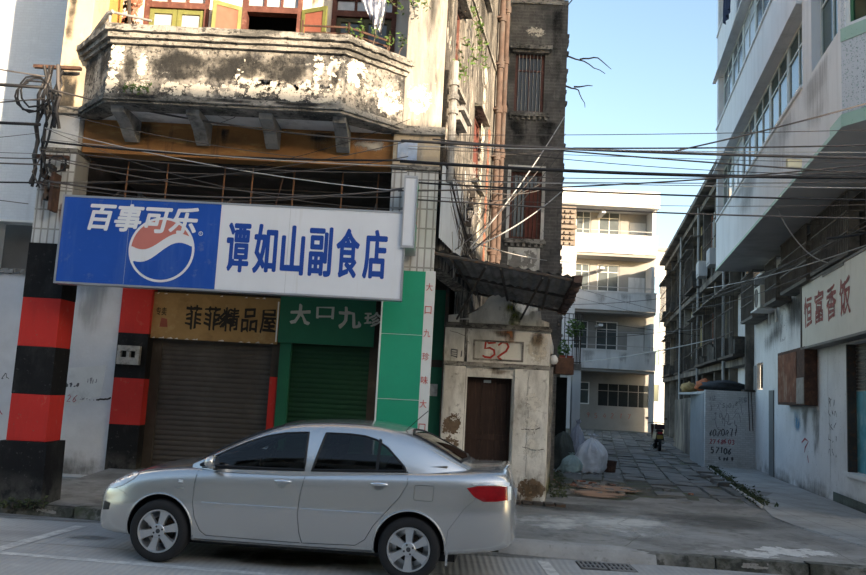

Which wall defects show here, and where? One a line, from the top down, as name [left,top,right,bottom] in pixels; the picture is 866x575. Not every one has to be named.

water stain [60,71,76,107]
water stain [89,51,107,79]
mould [125,58,135,76]
mould [158,52,304,83]
peeling [105,45,436,120]